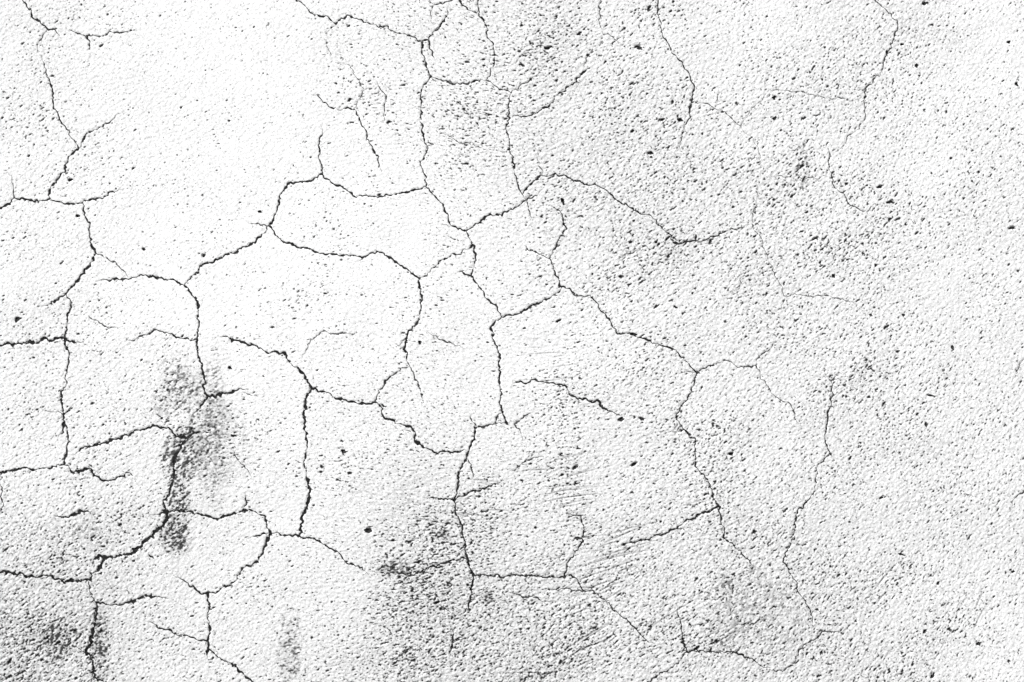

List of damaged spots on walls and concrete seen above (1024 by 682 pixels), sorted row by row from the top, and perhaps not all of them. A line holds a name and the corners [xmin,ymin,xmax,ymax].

crack [657,3,852,167]
crack [828,0,911,214]
crack [0,0,798,682]
crack [771,265,854,314]
crack [650,375,841,682]